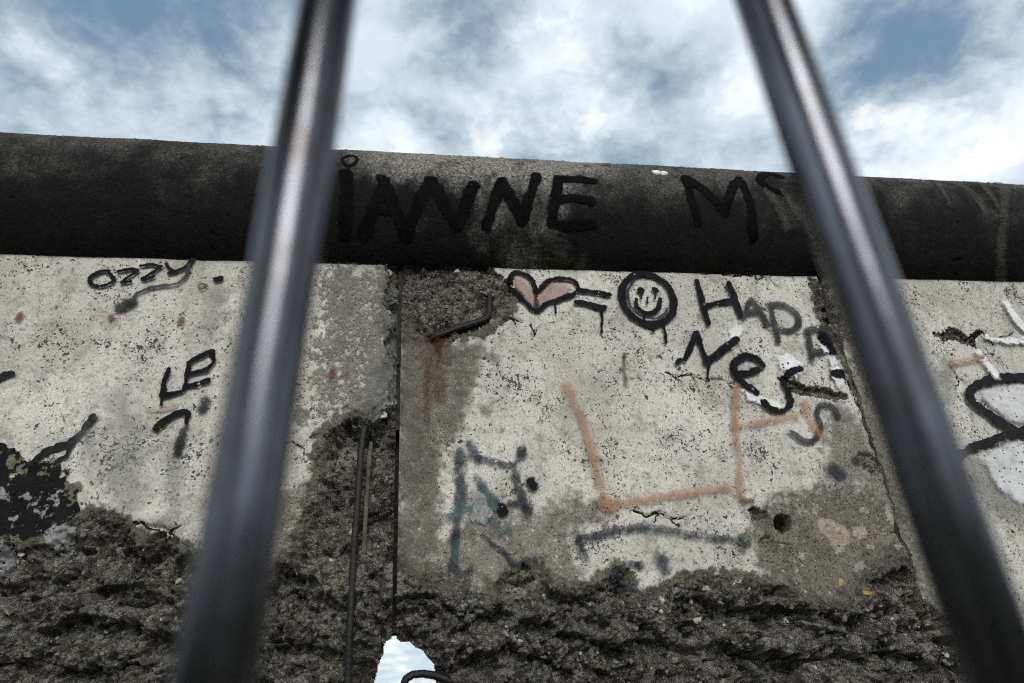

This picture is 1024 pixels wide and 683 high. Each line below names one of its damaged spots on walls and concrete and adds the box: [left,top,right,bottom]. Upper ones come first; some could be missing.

spalling [0,413,194,683]
spalling [260,264,961,683]
crack [633,509,684,527]